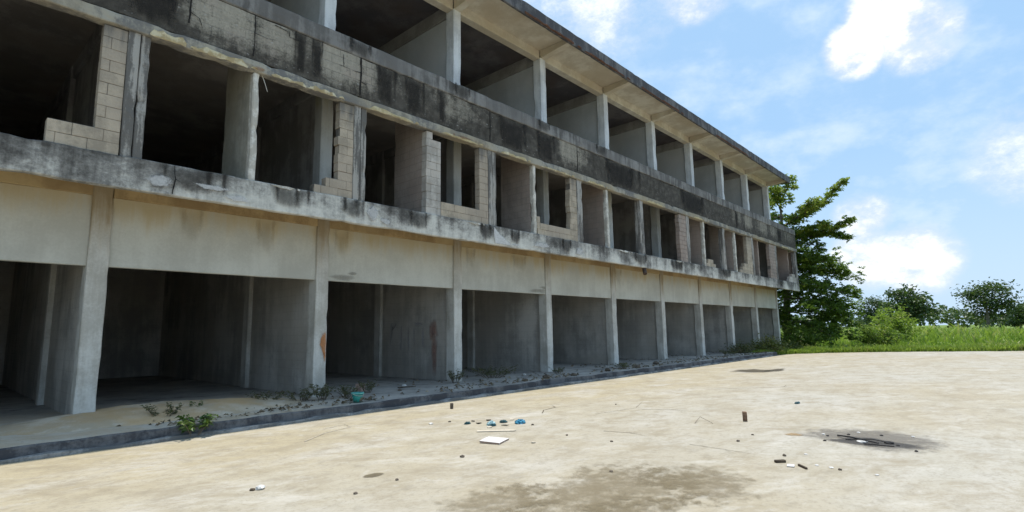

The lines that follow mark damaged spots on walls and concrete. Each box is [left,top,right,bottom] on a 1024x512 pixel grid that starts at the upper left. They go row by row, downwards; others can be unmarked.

crack [188,0,202,26]
crack [252,15,299,56]
spalling [150,29,345,180]
damp [377,65,425,111]
damp [499,115,555,160]
damp [165,163,226,191]
damp [276,184,310,204]
damp [597,147,640,188]
damp [682,189,704,212]